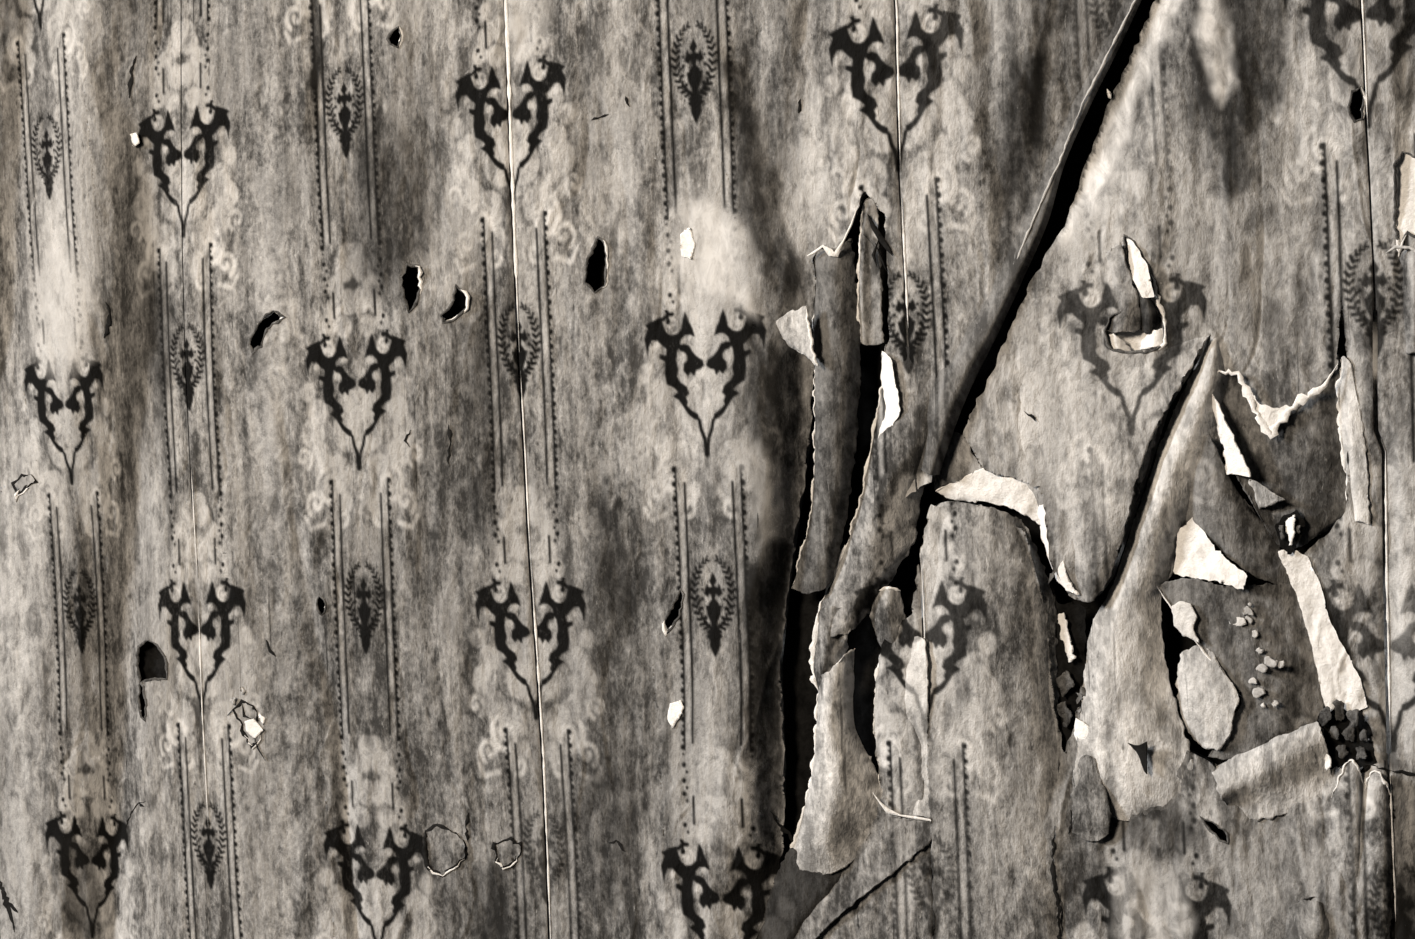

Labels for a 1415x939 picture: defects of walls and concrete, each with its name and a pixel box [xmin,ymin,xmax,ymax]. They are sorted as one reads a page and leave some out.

flaking render [1396,153,1415,257]
flaking render [250,311,284,350]
flaking render [403,266,423,311]
flaking render [442,289,470,322]
flaking render [586,239,609,292]
peeling [856,197,884,346]
flaking render [1106,237,1168,352]
peeling [936,468,1080,595]
peeling [1157,354,1371,821]
flaking render [138,641,166,719]
peeling [1074,718,1090,740]
peeling [794,810,932,939]